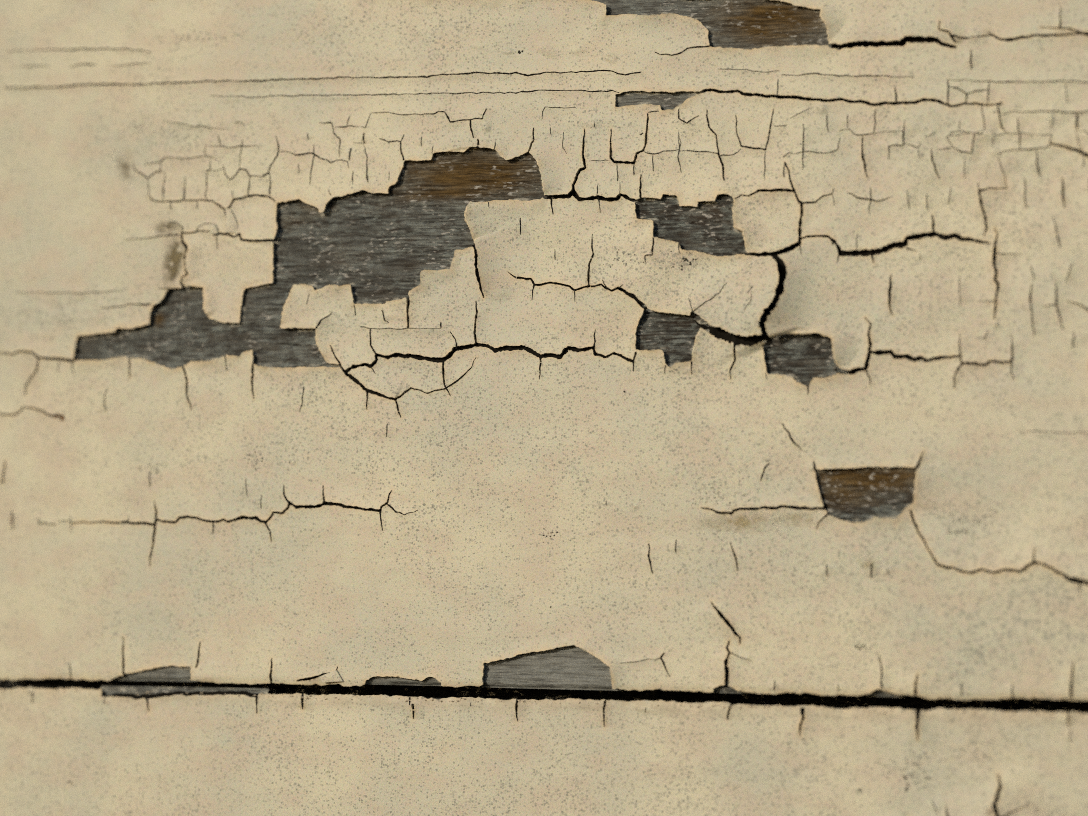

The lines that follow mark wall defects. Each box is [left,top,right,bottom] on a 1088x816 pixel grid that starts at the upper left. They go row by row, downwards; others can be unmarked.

peeling [592,0,839,50]
peeling [75,144,881,398]
crack [306,244,637,436]
crack [0,350,77,417]
crack [225,356,254,399]
crack [11,474,417,567]
peeling [815,462,920,522]
crack [911,511,1088,590]
peeling [101,645,622,705]